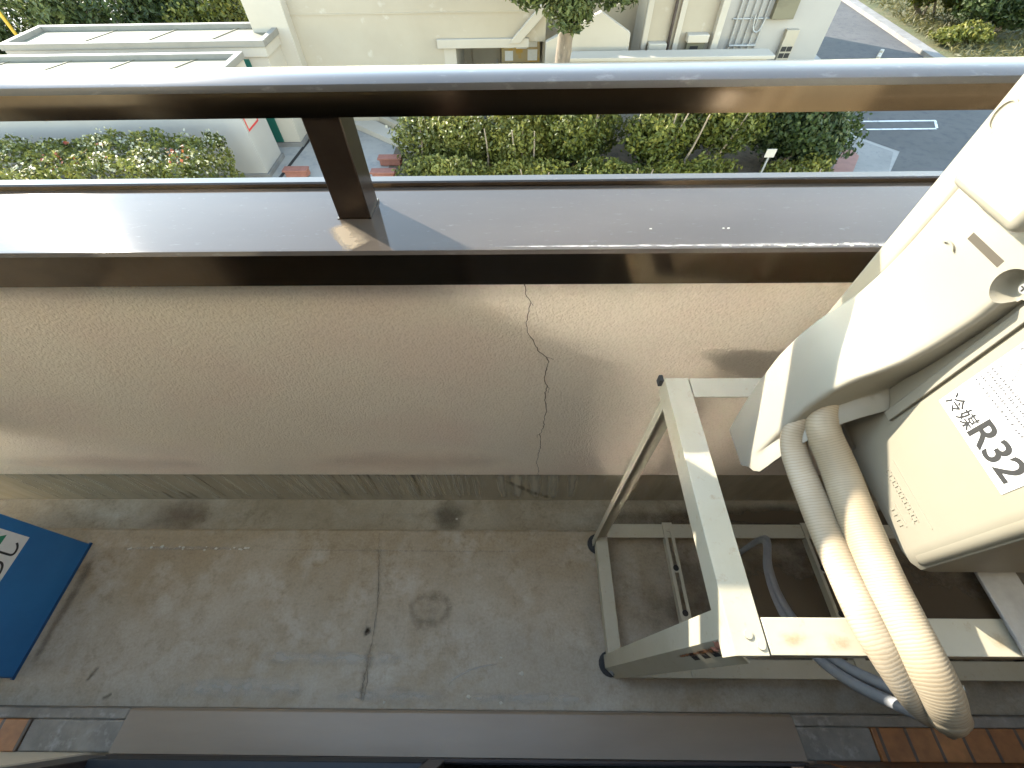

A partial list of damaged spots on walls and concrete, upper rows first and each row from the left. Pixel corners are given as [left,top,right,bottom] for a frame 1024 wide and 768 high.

crack [524,284,552,475]
crack [361,533,380,699]